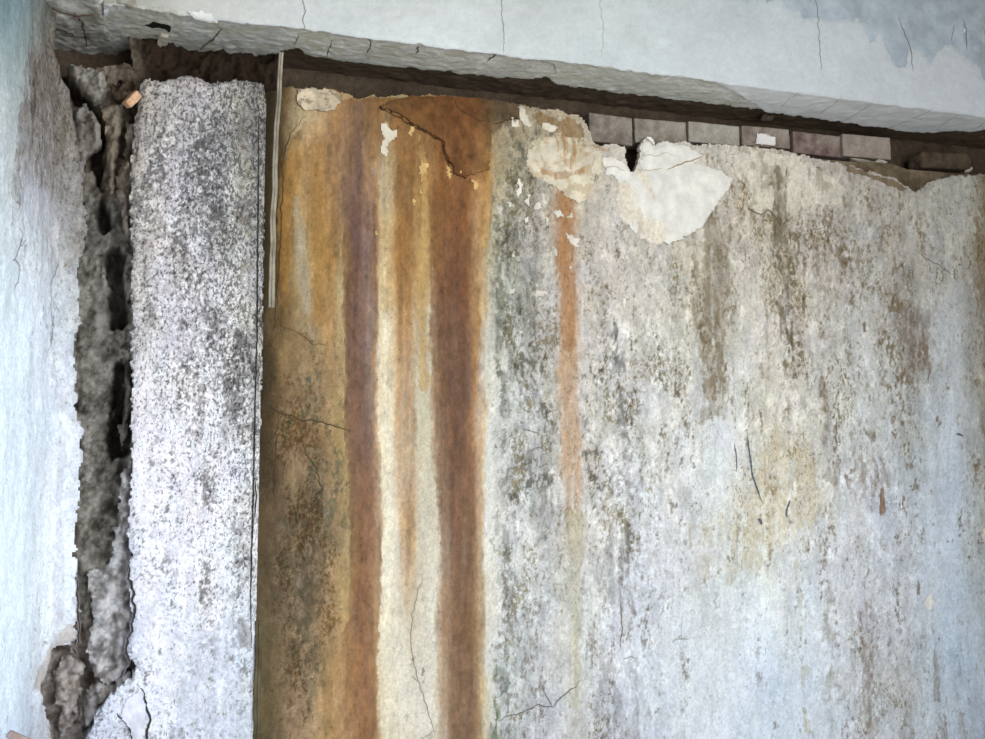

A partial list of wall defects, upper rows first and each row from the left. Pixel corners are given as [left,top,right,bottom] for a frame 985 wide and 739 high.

crack [200,29,222,51]
crack [814,0,822,69]
crack [40,13,152,739]
corrosion [276,96,518,739]
damp [486,193,553,739]
corrosion [545,185,589,710]
flaking render [497,105,848,247]
damp [690,209,733,426]
damp [759,164,802,383]
damp [687,373,890,586]
flaking render [33,624,77,692]
flaking render [121,692,147,739]